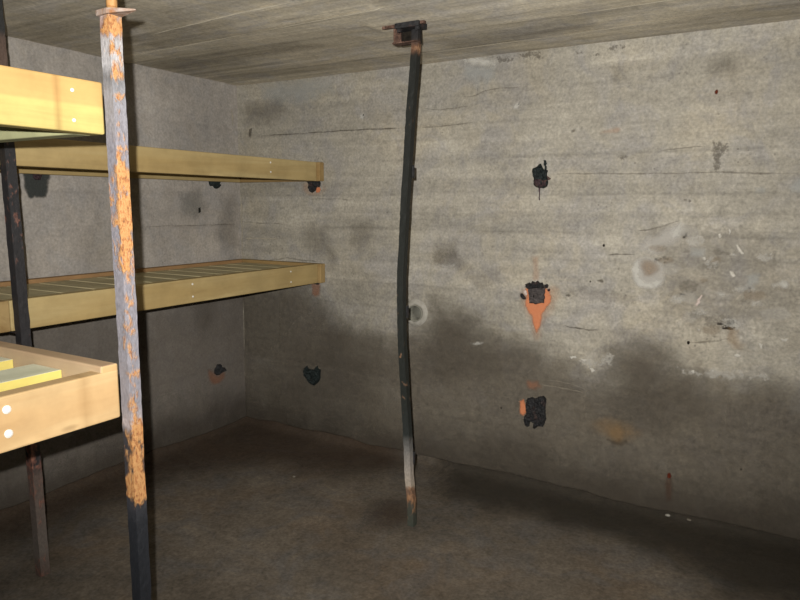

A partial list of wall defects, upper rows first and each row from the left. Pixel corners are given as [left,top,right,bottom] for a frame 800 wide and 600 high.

damp [31,321,119,367]
rust [526,288,551,332]
damp [0,446,31,530]
damp [39,420,126,514]
damp [139,289,800,598]